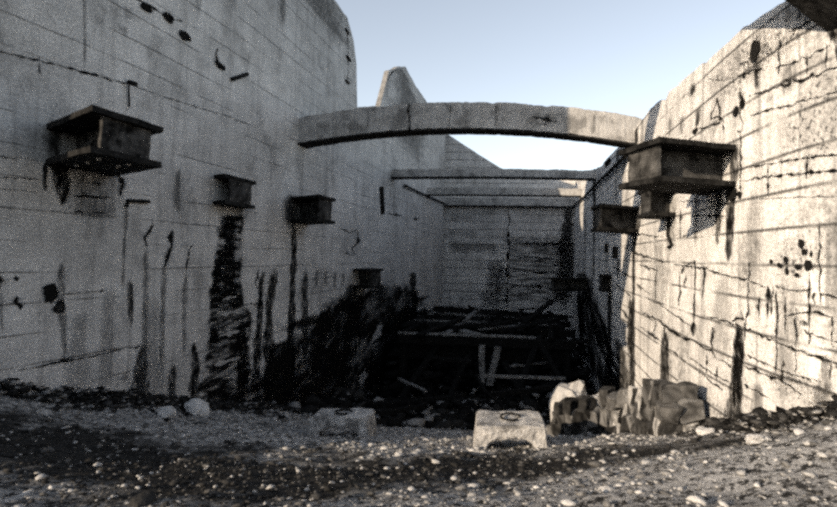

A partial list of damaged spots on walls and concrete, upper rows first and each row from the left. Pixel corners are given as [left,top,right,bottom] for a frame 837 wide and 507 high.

water stain [238,285,432,407]
water stain [487,210,629,392]